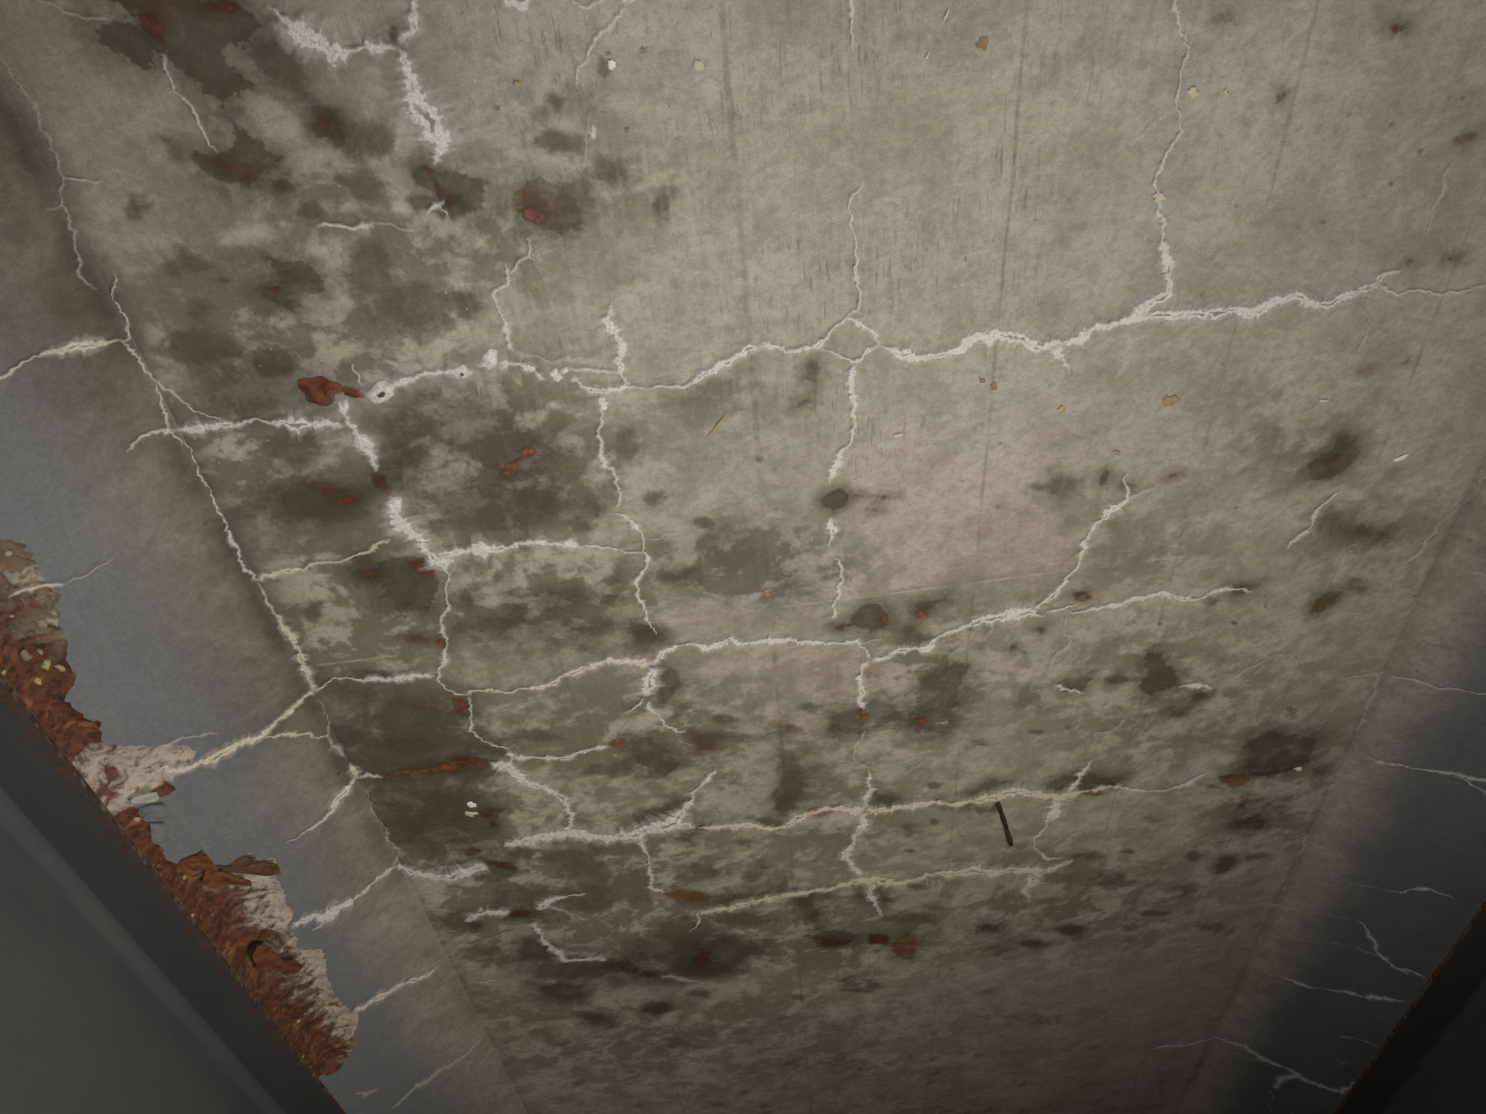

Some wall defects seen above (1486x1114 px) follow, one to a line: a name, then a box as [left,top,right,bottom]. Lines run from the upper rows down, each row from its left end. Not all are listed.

leakage [94,0,346,192]
crack [272,0,453,163]
crack [650,0,1486,482]
corrosion [340,386,367,398]
leakage [1308,434,1361,481]
leakage [820,488,848,511]
crack [0,277,1251,930]
spalling [0,538,359,1077]
leakage [1047,773,1115,794]
crack [465,893,605,962]
corrosion [815,933,918,960]
crack [354,966,437,1013]